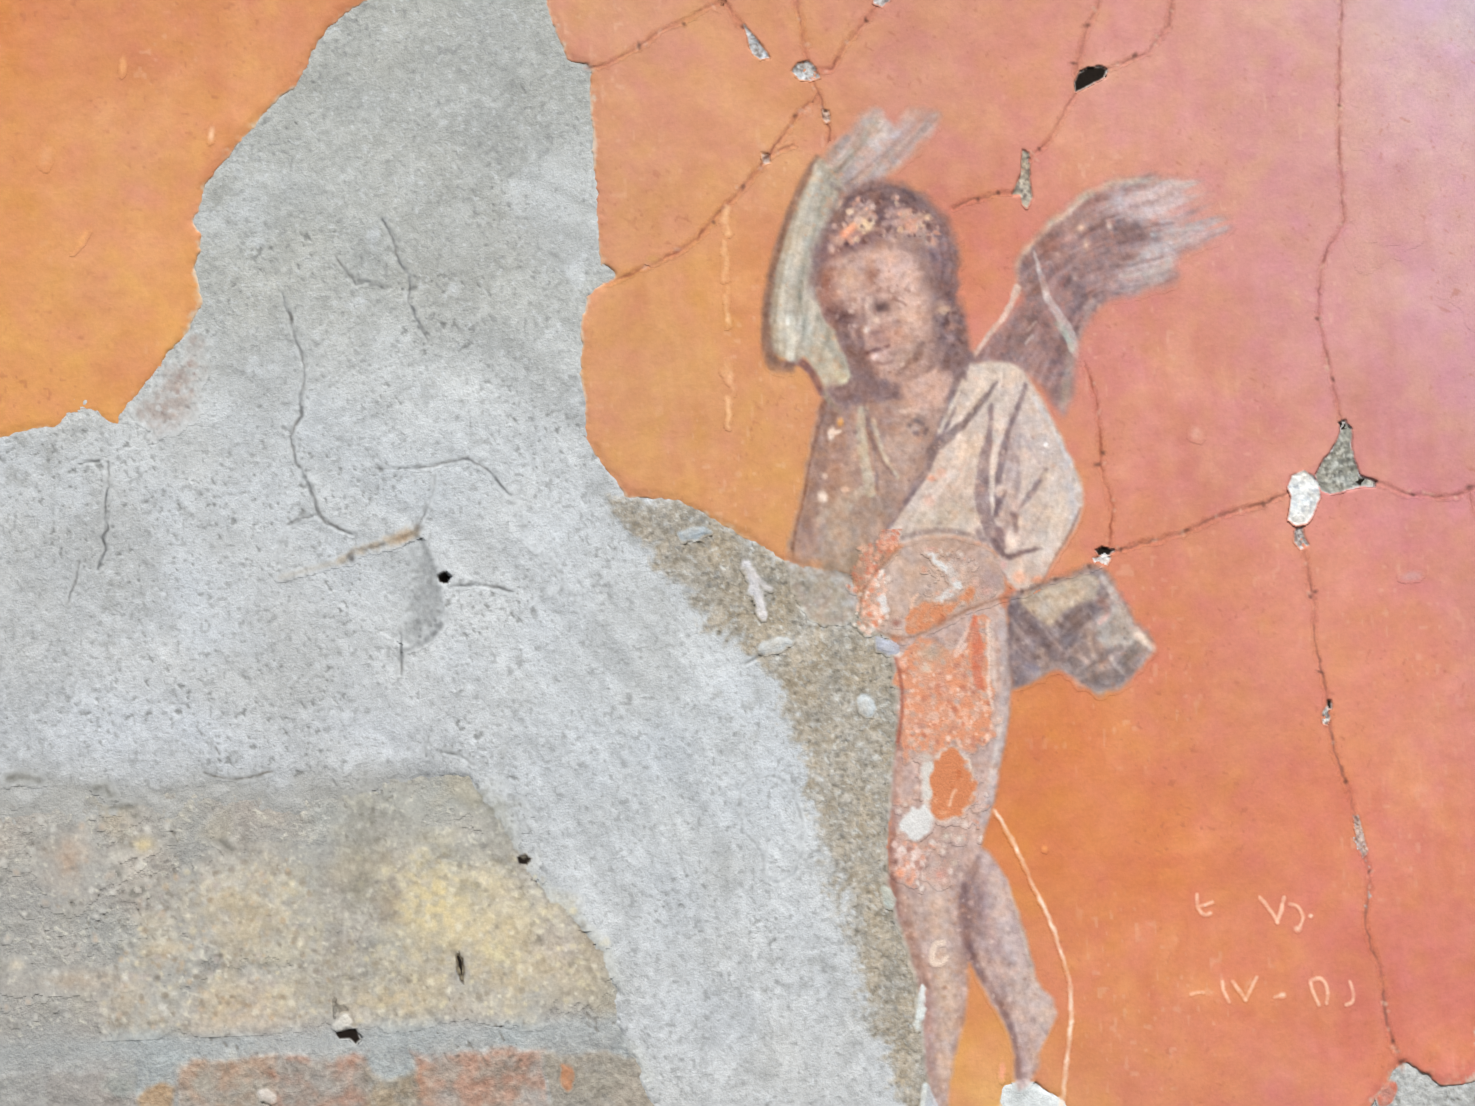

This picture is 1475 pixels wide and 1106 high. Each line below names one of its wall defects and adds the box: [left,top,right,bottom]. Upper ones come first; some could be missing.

crack [582,0,879,288]
spalling [743,23,771,61]
spalling [1011,149,1033,209]
crack [949,0,1176,212]
crack [1313,0,1349,423]
crack [277,290,357,538]
spalling [397,541,452,654]
spalling [739,556,796,657]
crack [835,360,1290,645]
spalling [1287,422,1377,551]
crack [1300,543,1408,1075]
spalling [331,1011,354,1032]